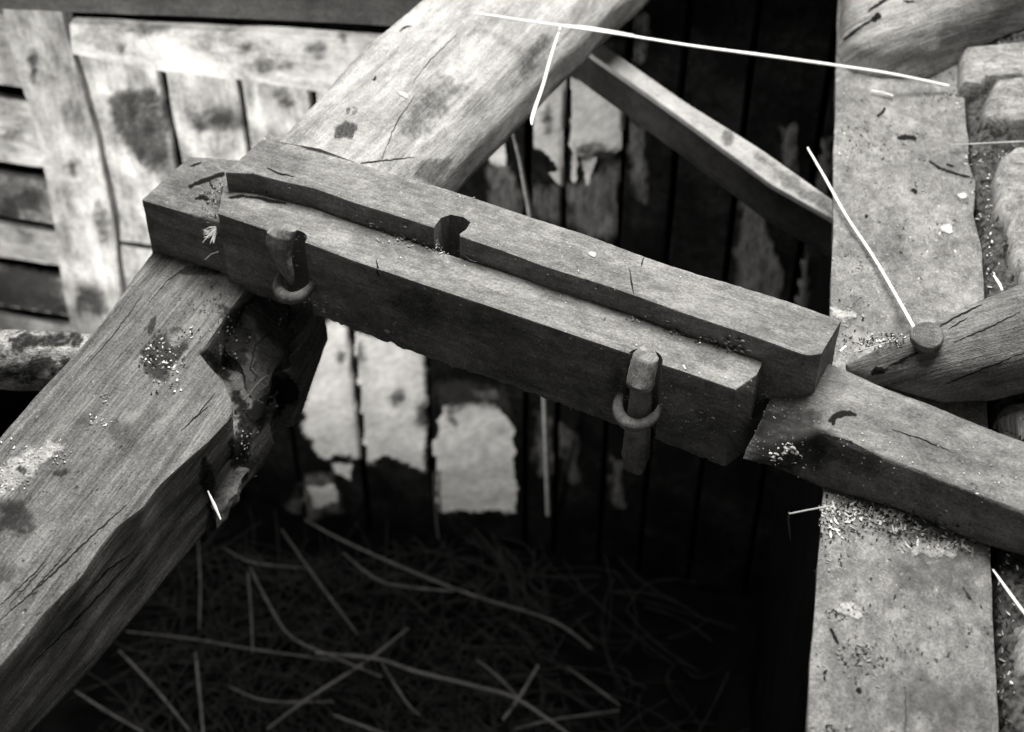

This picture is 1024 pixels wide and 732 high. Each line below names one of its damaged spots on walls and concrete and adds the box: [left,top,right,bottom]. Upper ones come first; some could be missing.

crack [360,35,456,164]
crack [940,304,1019,343]
crack [0,505,126,620]
crack [29,553,139,668]